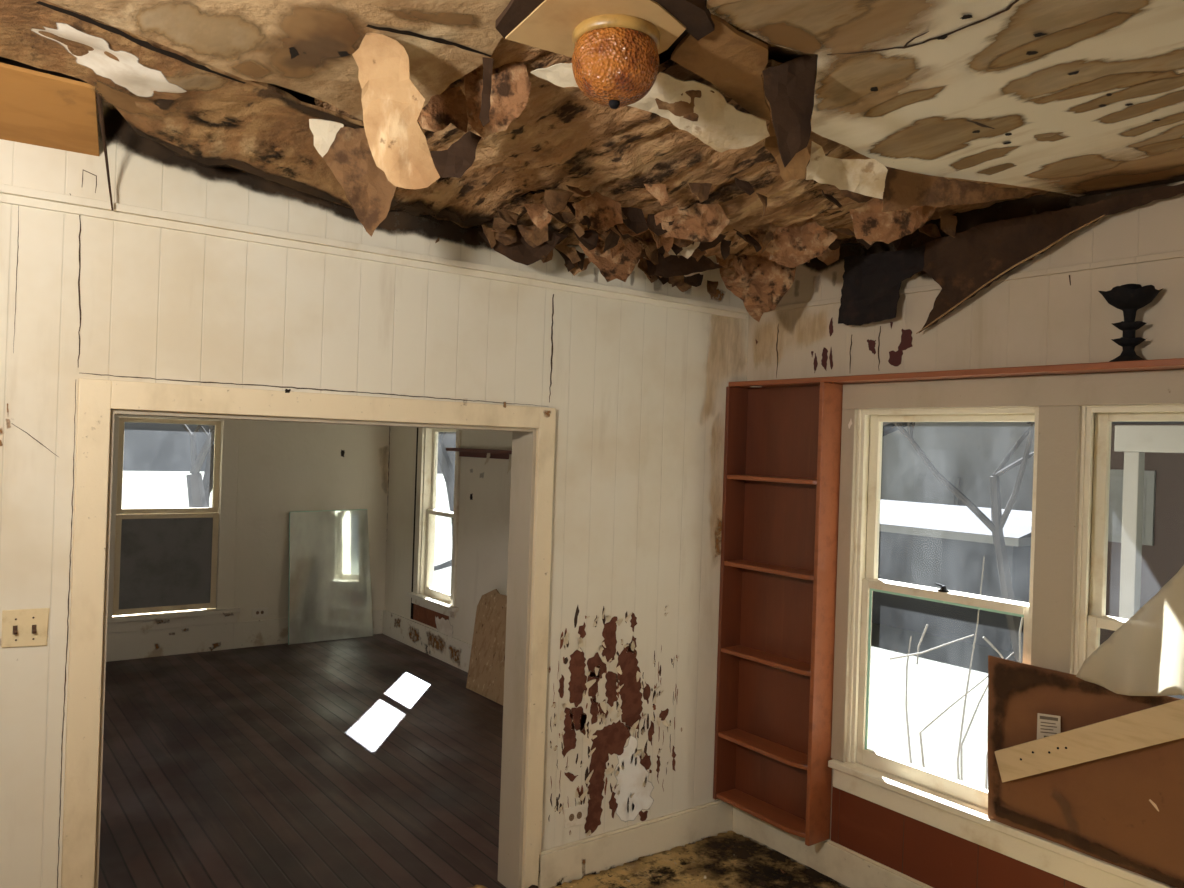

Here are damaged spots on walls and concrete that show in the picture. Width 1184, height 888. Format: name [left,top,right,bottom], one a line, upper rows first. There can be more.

water stain [387,10,479,27]
water stain [94,2,365,223]
water stain [803,0,1184,272]
water stain [376,142,615,250]
water stain [611,153,701,195]
water stain [680,174,773,210]
peeling [811,318,833,373]
peeling [867,322,913,367]
crack [11,170,554,888]
peeling [394,616,461,665]
peeling [547,606,683,837]